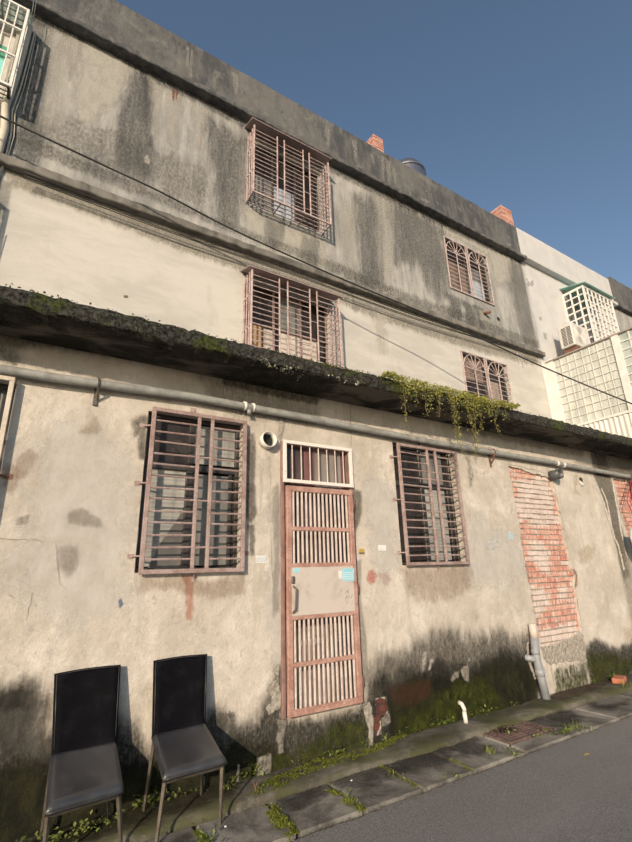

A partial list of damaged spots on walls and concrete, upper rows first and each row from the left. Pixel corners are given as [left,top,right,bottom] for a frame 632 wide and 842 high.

leakage [12,13,534,346]
leakage [246,435,281,689]
leakage [353,481,397,569]
leakage [465,518,525,586]
leakage [0,680,52,769]
leakage [117,726,159,774]
leakage [205,630,538,769]
spalling [374,698,388,734]
leakage [586,640,632,683]